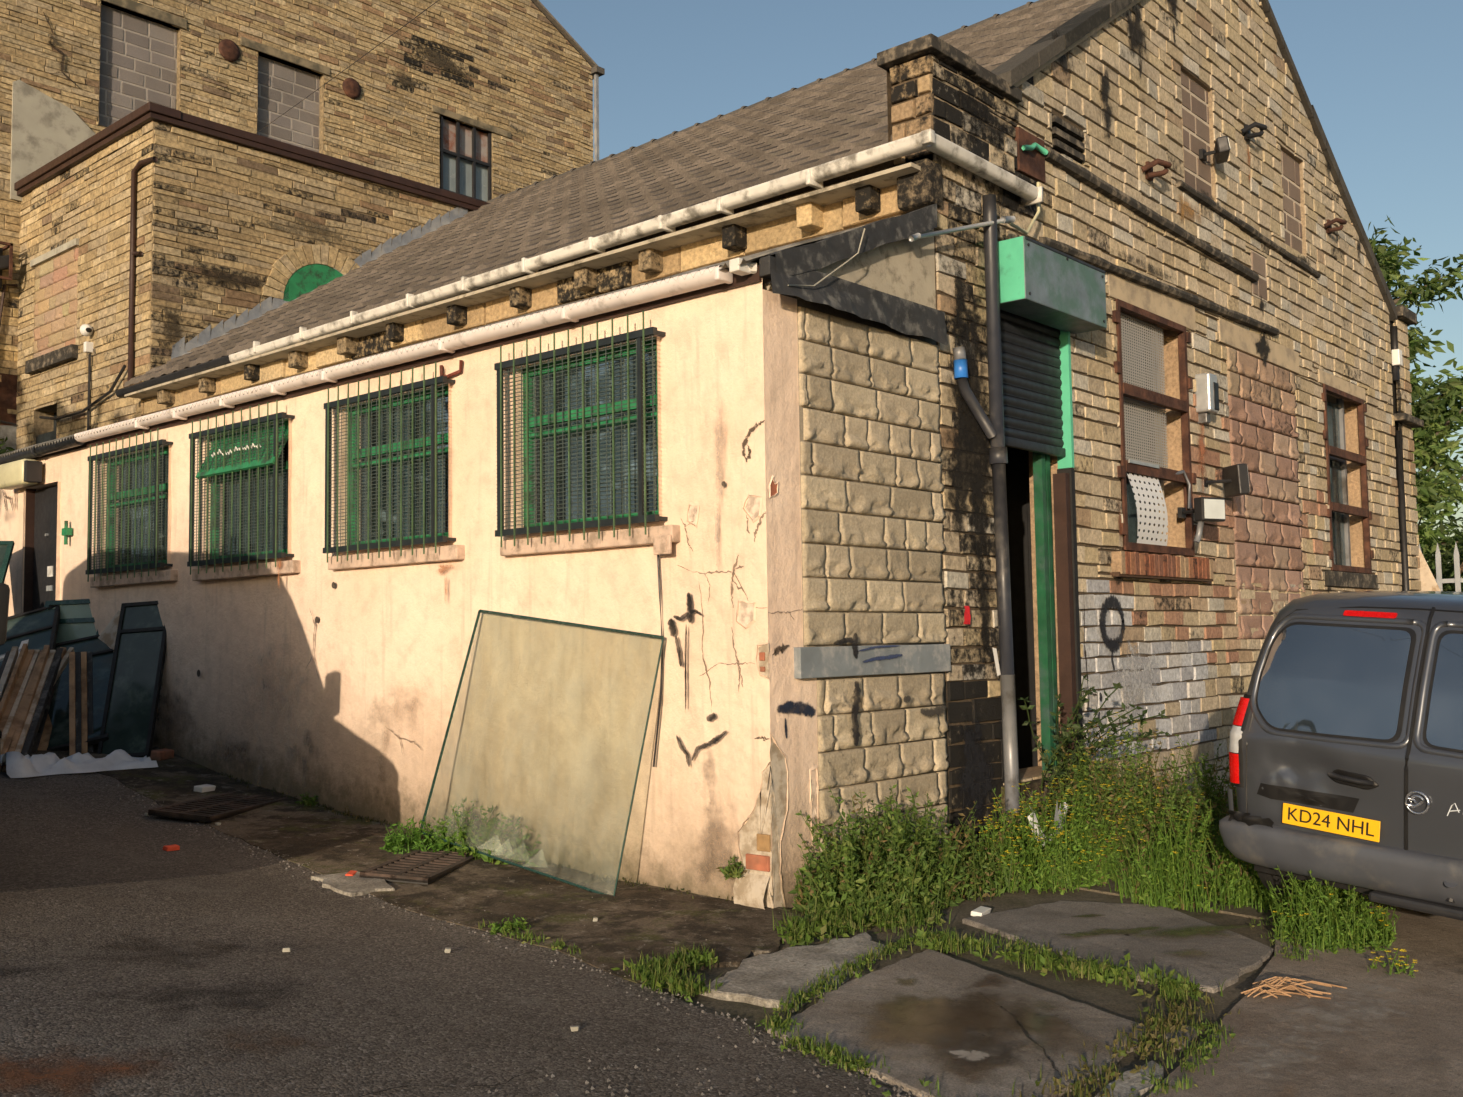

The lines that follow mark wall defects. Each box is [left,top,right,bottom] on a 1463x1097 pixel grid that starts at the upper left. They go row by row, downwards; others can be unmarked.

water stain [954,266,965,345]
crack [678,510,802,713]
water stain [978,570,990,656]
spalling [733,734,788,910]